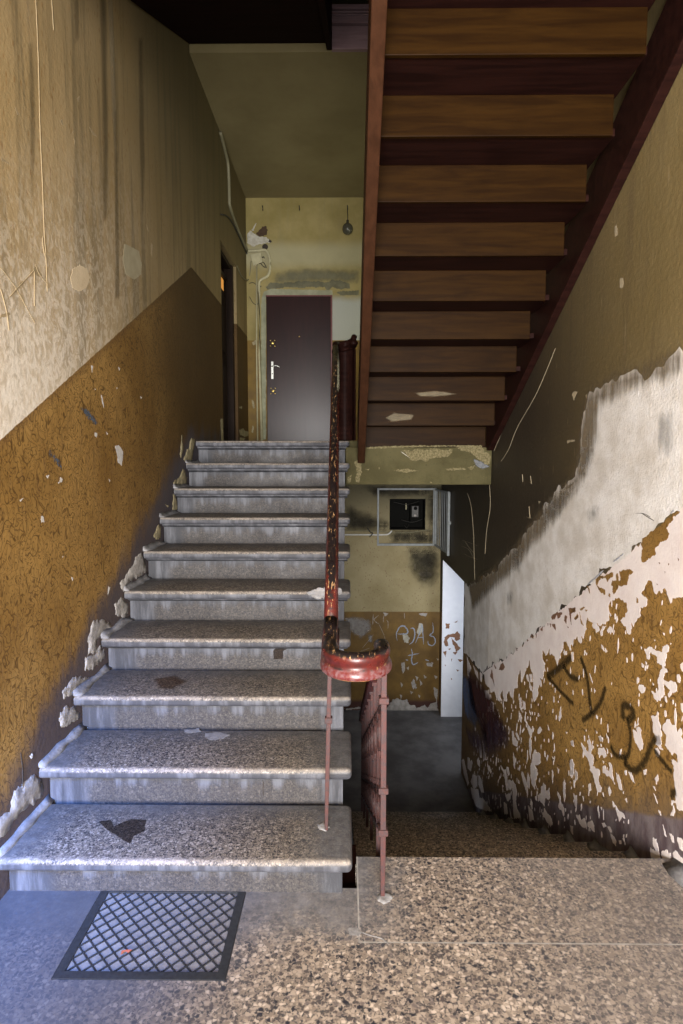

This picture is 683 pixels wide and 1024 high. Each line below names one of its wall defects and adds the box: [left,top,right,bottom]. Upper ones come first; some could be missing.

leakage [35,0,48,292]
leakage [266,270,359,296]
flaking render [165,436,195,510]
flaking render [367,440,499,473]
flaking render [59,553,147,728]
flaking render [387,347,683,863]